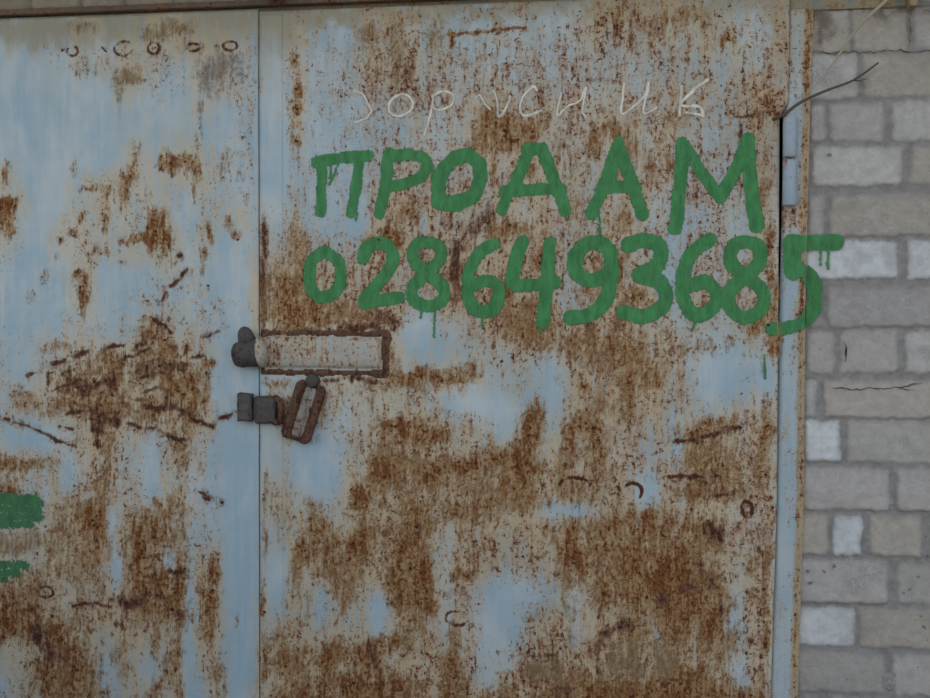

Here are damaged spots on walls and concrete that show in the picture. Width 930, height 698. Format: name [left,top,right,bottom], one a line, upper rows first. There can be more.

rust [0,162,23,241]
rust [73,268,92,326]
rust [70,140,143,211]
rust [117,207,175,268]
rust [140,15,243,202]
rust [286,50,305,147]
rust [466,105,554,185]
rust [554,117,675,230]
rust [678,145,784,365]
crack [832,383,922,391]
rust [259,197,775,698]
rust [0,316,220,698]